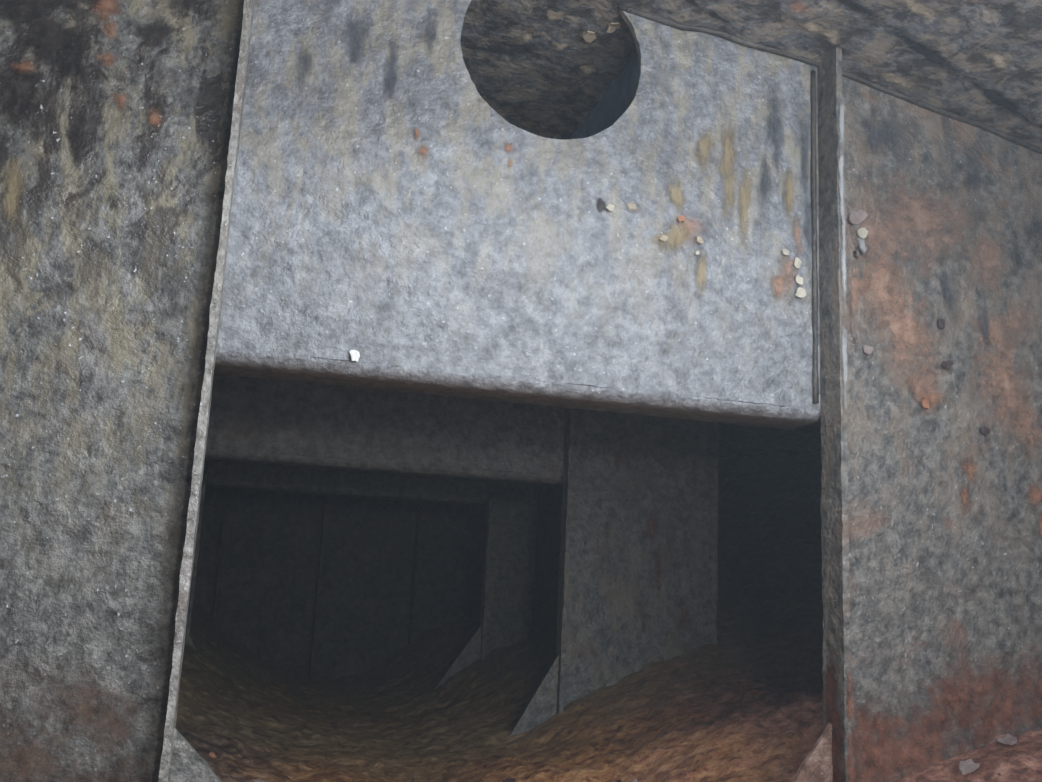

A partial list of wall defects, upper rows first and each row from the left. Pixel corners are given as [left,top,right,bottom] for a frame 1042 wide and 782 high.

damp [0,66,37,218]
damp [68,116,88,161]
rust [824,649,854,782]